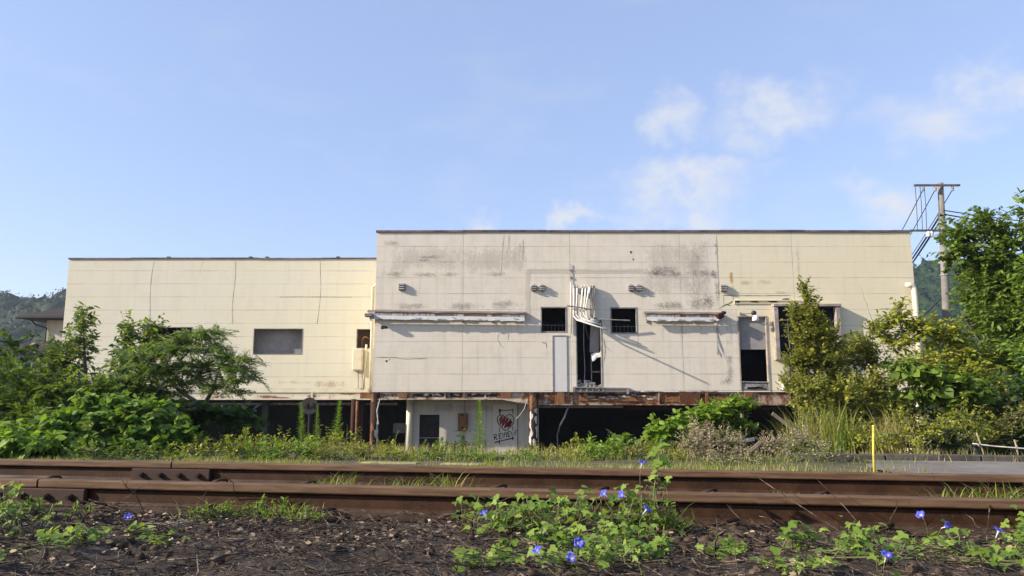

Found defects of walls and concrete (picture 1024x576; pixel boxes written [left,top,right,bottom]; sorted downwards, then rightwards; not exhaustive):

rust [371,393,537,410]
rust [555,393,680,403]
rust [700,393,742,402]